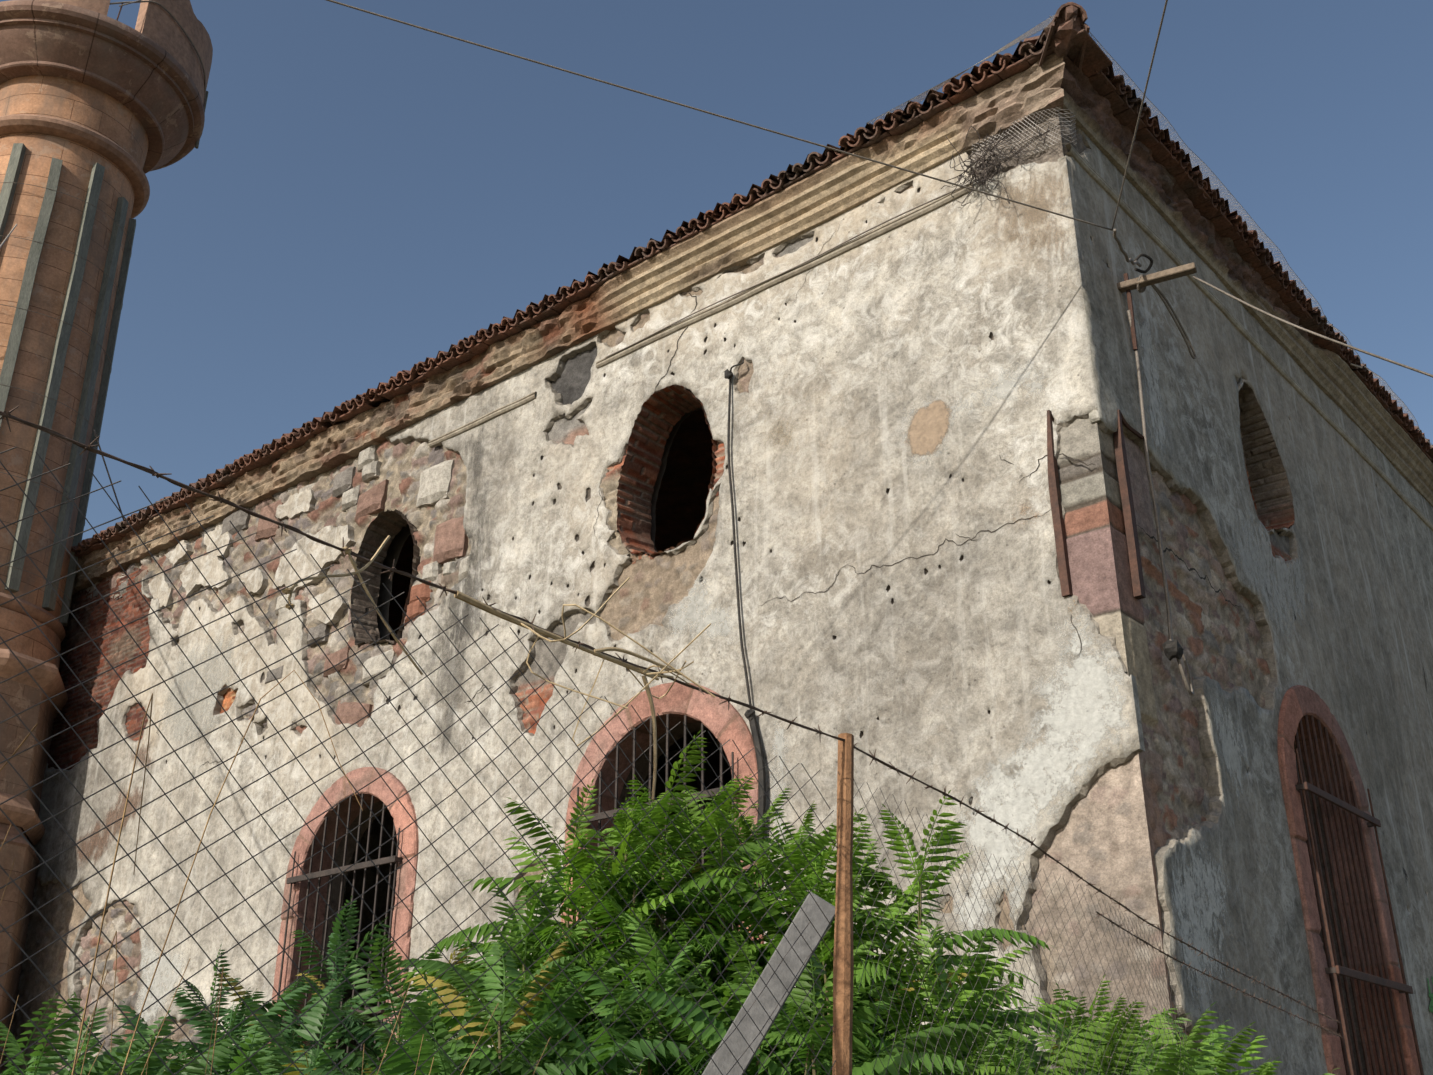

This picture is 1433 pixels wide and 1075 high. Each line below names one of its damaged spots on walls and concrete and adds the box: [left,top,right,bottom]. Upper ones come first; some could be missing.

spalling [533,310,650,477]
spalling [46,436,471,771]
spalling [509,440,746,736]
crack [756,509,1051,609]
spalling [995,413,1277,1070]
spalling [4,877,215,1075]